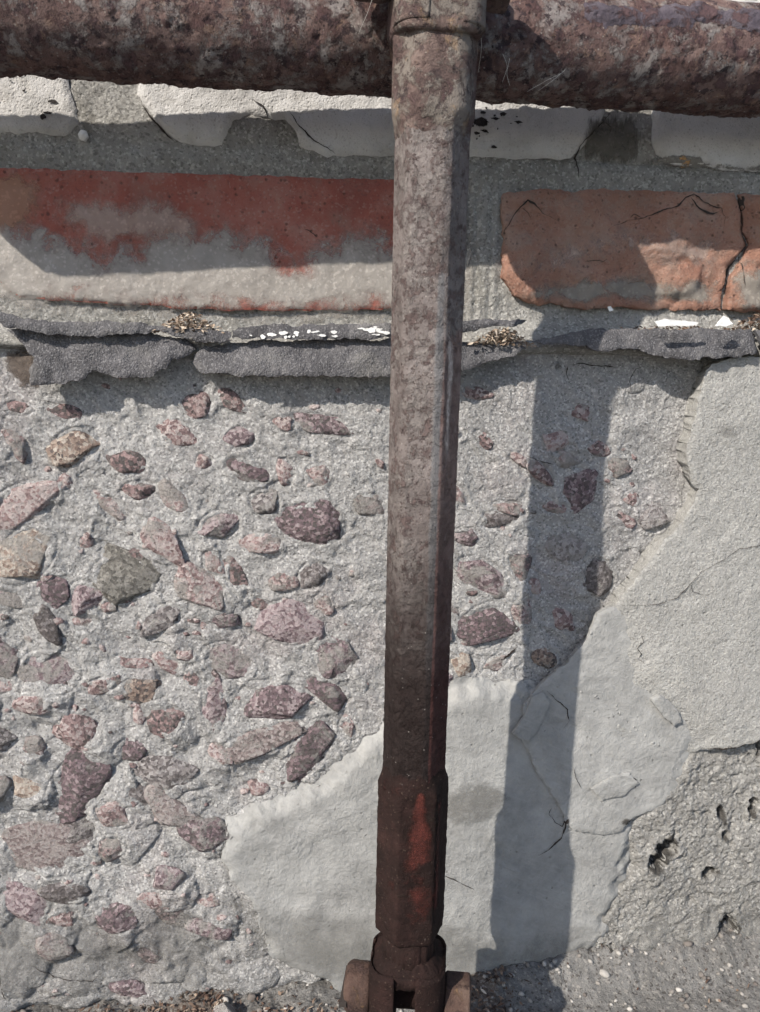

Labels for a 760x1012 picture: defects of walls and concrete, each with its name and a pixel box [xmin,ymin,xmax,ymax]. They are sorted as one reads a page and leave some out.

crack [574,112,611,177]
crack [609,194,747,309]
spalling [0,349,390,1012]
spalling [438,354,760,974]
crack [542,808,569,854]